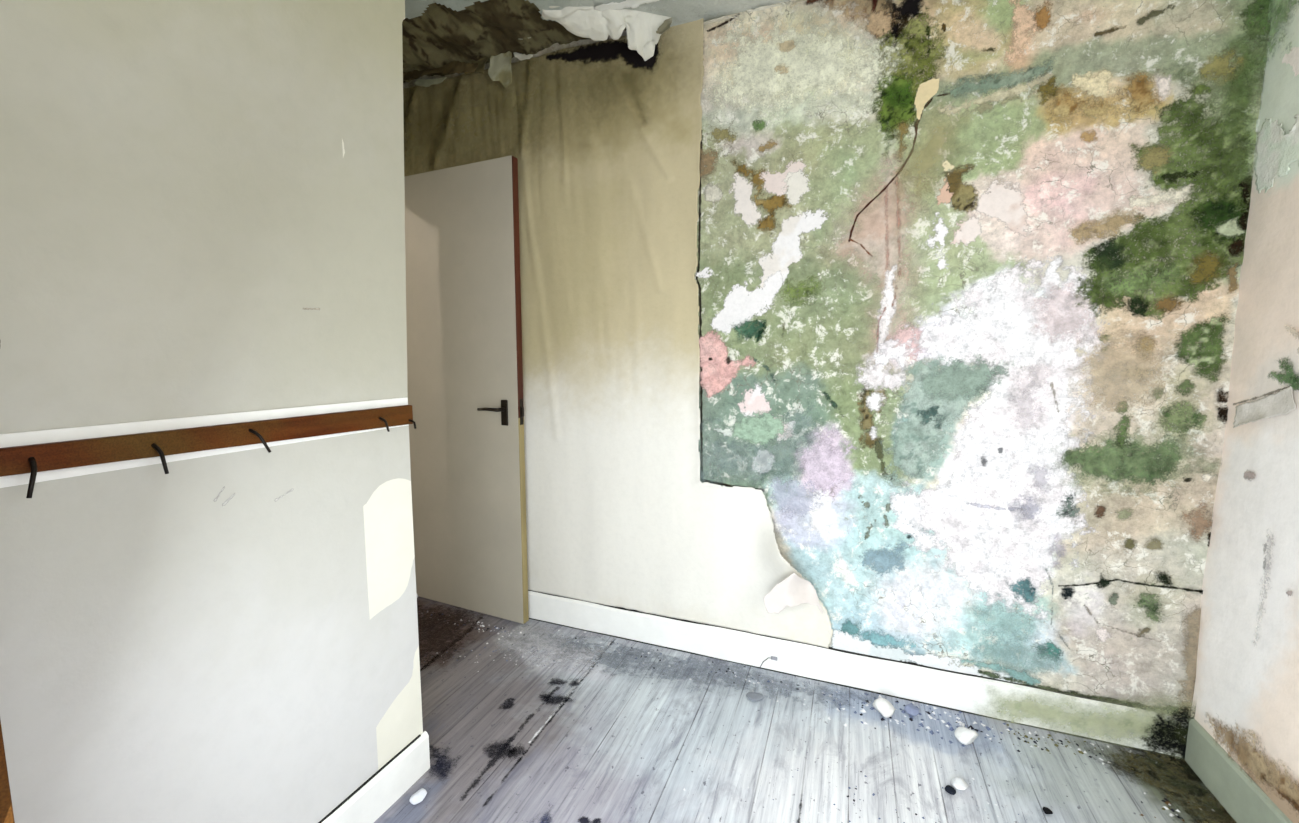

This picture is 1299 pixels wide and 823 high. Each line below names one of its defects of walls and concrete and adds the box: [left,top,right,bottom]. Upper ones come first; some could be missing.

peeling [403,37,533,88]
leakage [403,63,659,165]
peeling [1253,114,1299,194]
peeling [710,160,829,335]
peeling [927,161,1032,270]
leakage [867,0,1273,619]
leakage [1268,326,1299,390]
peeling [738,384,795,475]
peeling [831,630,1189,714]
crack [1045,569,1203,715]
leakage [997,697,1237,823]
leakage [1208,714,1299,810]